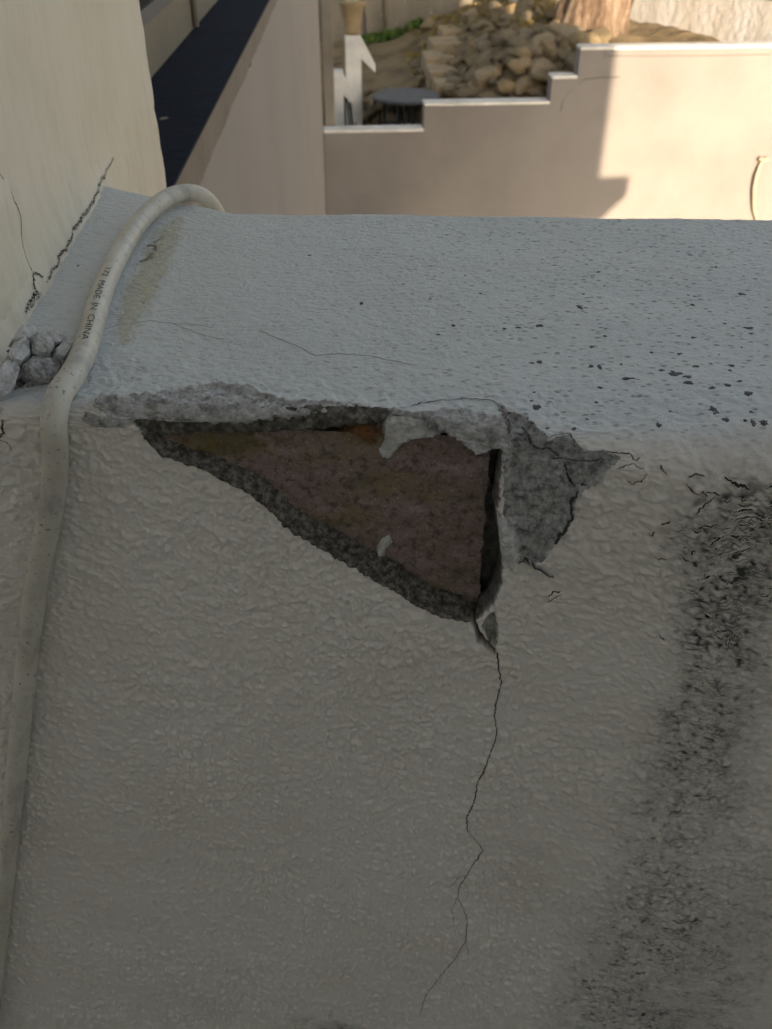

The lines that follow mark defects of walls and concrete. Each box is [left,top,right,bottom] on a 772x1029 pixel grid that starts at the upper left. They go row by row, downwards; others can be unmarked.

crack [0,157,114,314]
flaking render [0,324,73,402]
peeling [659,354,720,385]
flaking render [81,381,621,647]
damp [682,484,772,715]
crack [420,652,503,1014]